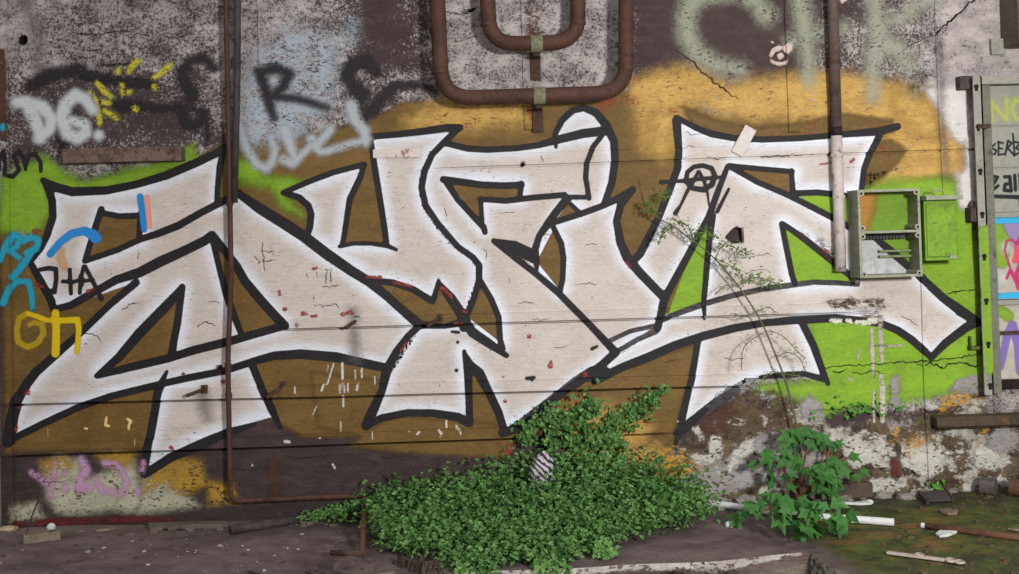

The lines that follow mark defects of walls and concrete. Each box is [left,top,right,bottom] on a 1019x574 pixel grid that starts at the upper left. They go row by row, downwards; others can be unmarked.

corrosion [527,11,540,35]
crack [898,0,975,54]
peeling [648,415,823,495]
peeling [800,394,824,423]
peeling [841,374,1019,492]